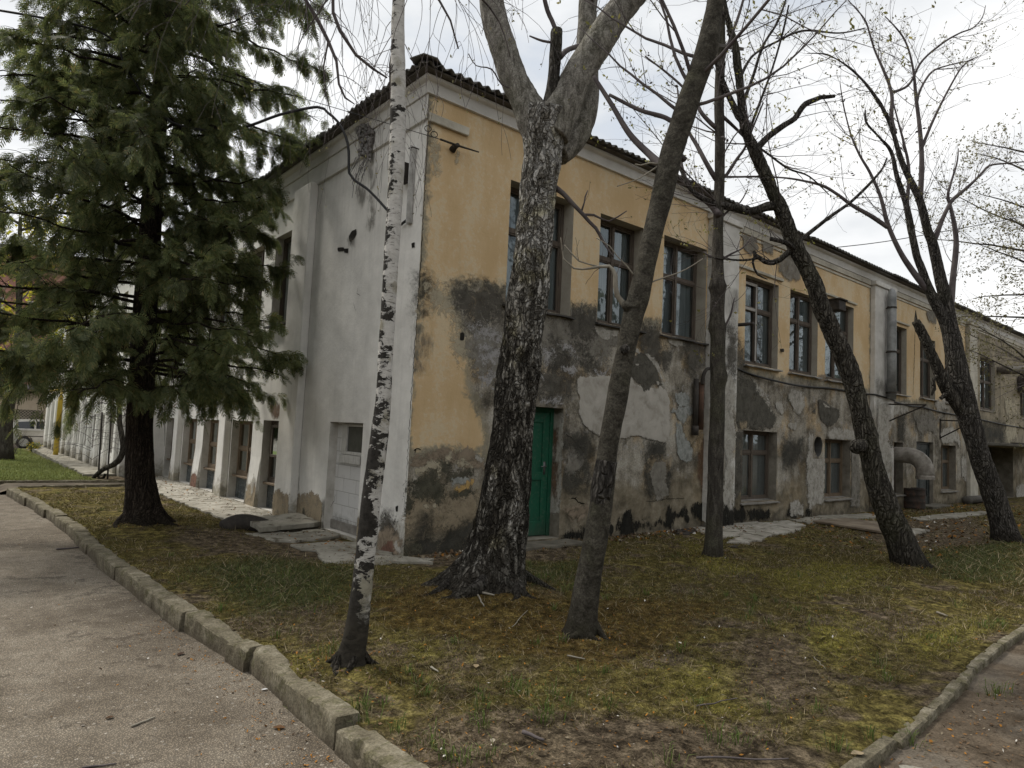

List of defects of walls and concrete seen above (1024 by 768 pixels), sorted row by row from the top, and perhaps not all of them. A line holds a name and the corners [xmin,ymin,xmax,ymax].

damp [445,278,505,391]
spalling [595,326,619,340]
flaking render [631,349,693,463]
flaking render [723,373,784,509]
flaking render [813,399,840,426]
damp [379,454,475,553]